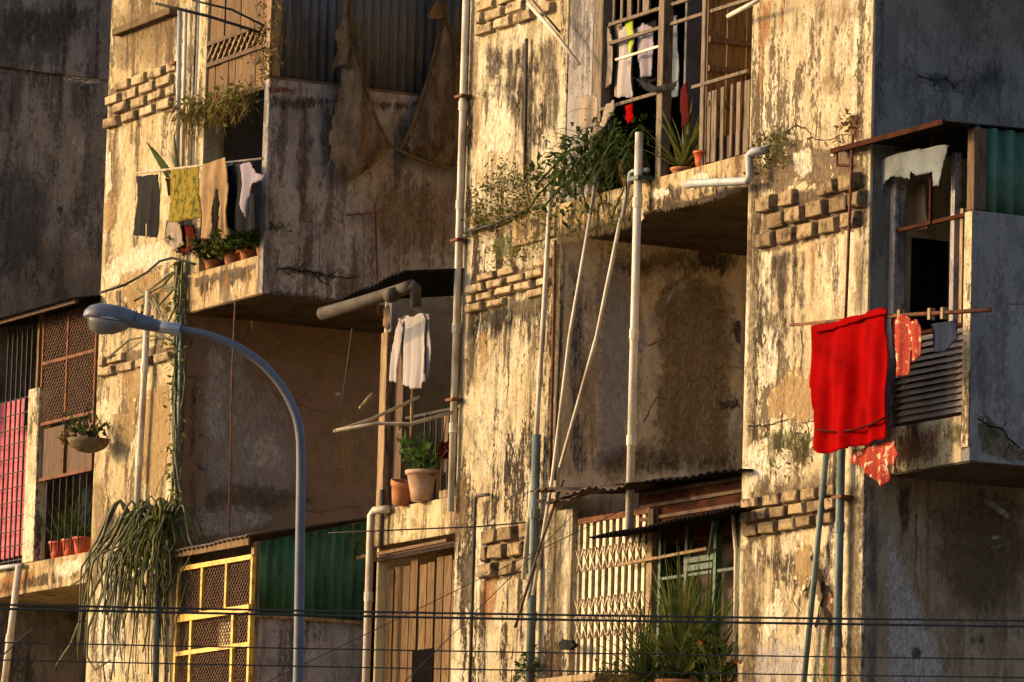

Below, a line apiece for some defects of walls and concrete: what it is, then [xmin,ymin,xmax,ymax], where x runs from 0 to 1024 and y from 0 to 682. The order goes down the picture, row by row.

leakage [471,37,559,163]
crack [918,70,965,93]
spalling [761,136,863,194]
leakage [194,264,255,298]
crack [266,239,359,285]
leakage [466,162,812,477]
crack [643,336,738,432]
peeling [743,323,814,492]
crack [977,418,1024,453]
leakage [929,496,1024,617]